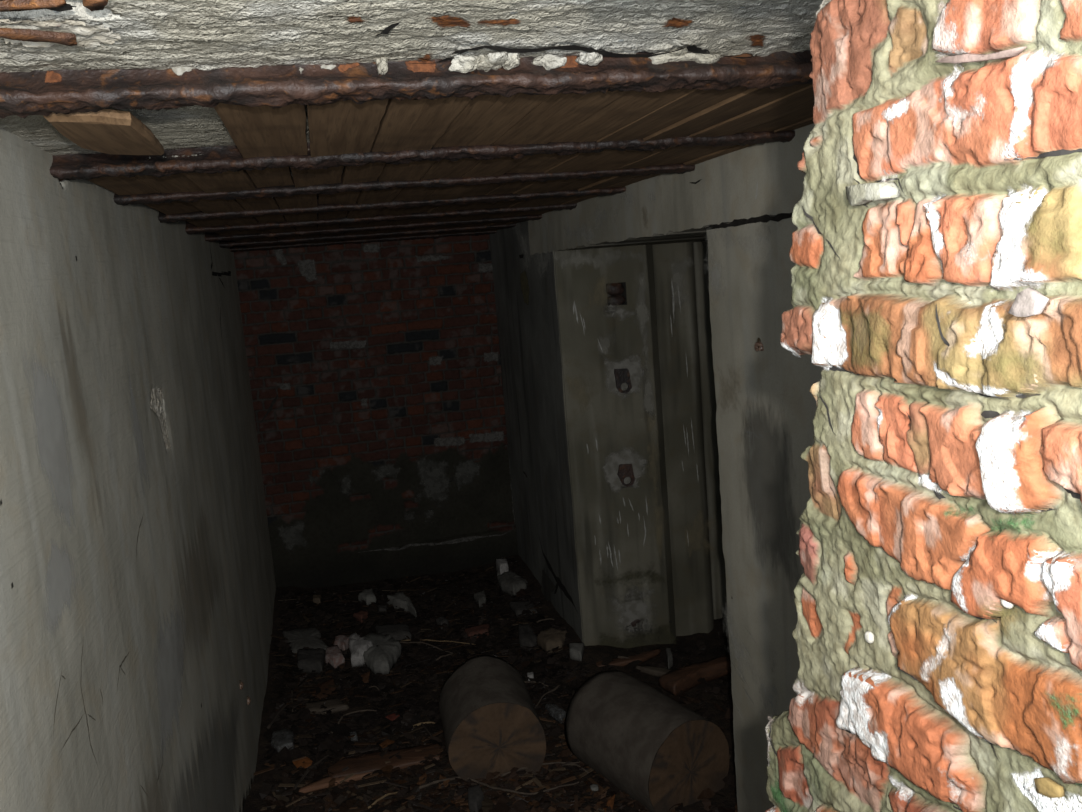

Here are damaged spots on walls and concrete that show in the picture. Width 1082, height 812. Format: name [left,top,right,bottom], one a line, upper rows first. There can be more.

rust [0,0,66,12]
rust [82,0,108,11]
rust [0,28,77,46]
rust [45,71,62,83]
rust [405,54,436,72]
rust [561,55,578,68]
damp [989,187,1048,289]
damp [781,298,848,370]
damp [975,412,1030,514]
damp [836,668,913,803]
damp [939,678,984,738]
damp [1012,740,1082,812]